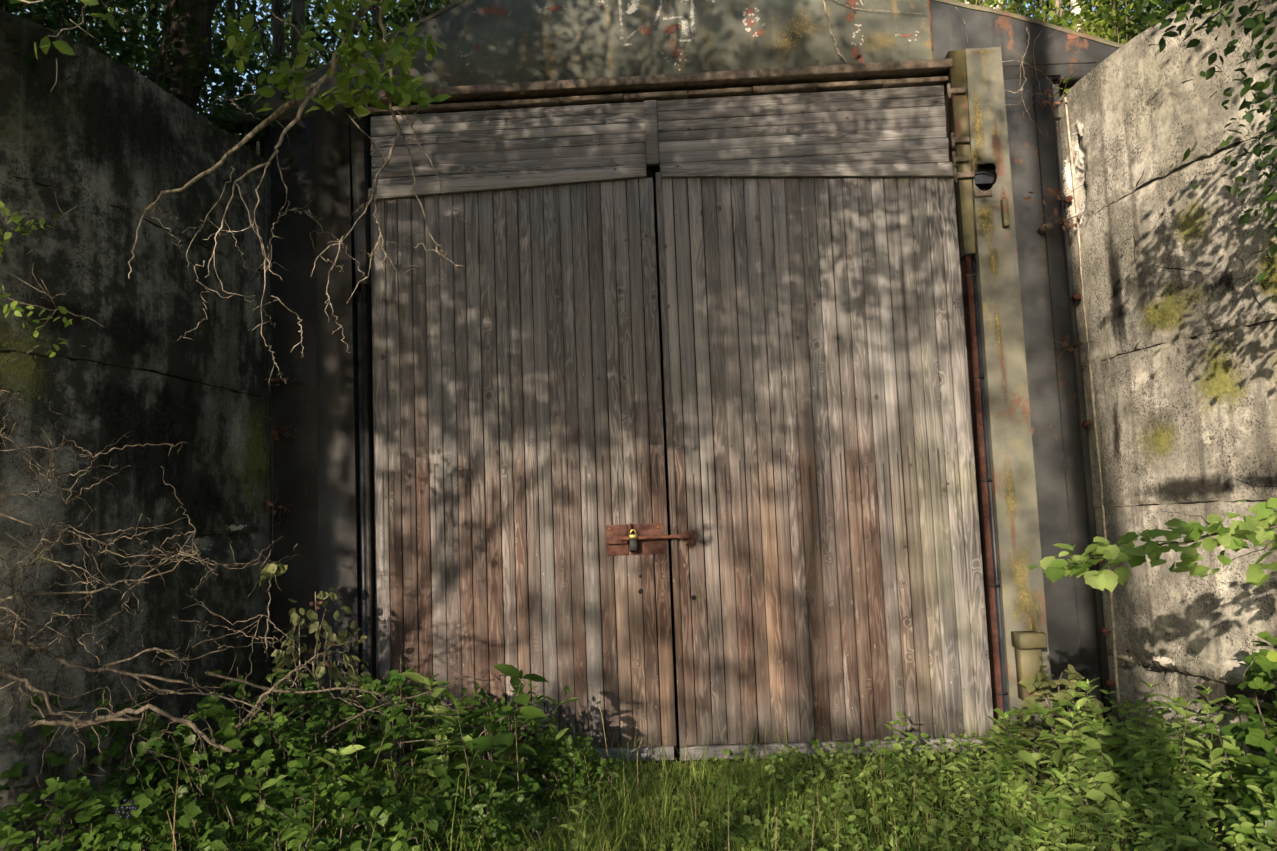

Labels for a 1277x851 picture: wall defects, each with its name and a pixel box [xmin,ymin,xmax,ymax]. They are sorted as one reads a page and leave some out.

peeling [742,8,765,37]
peeling [845,0,864,63]
crack [1085,125,1277,228]
crack [1084,235,1277,367]
water stain [1211,271,1234,295]
crack [0,350,266,405]